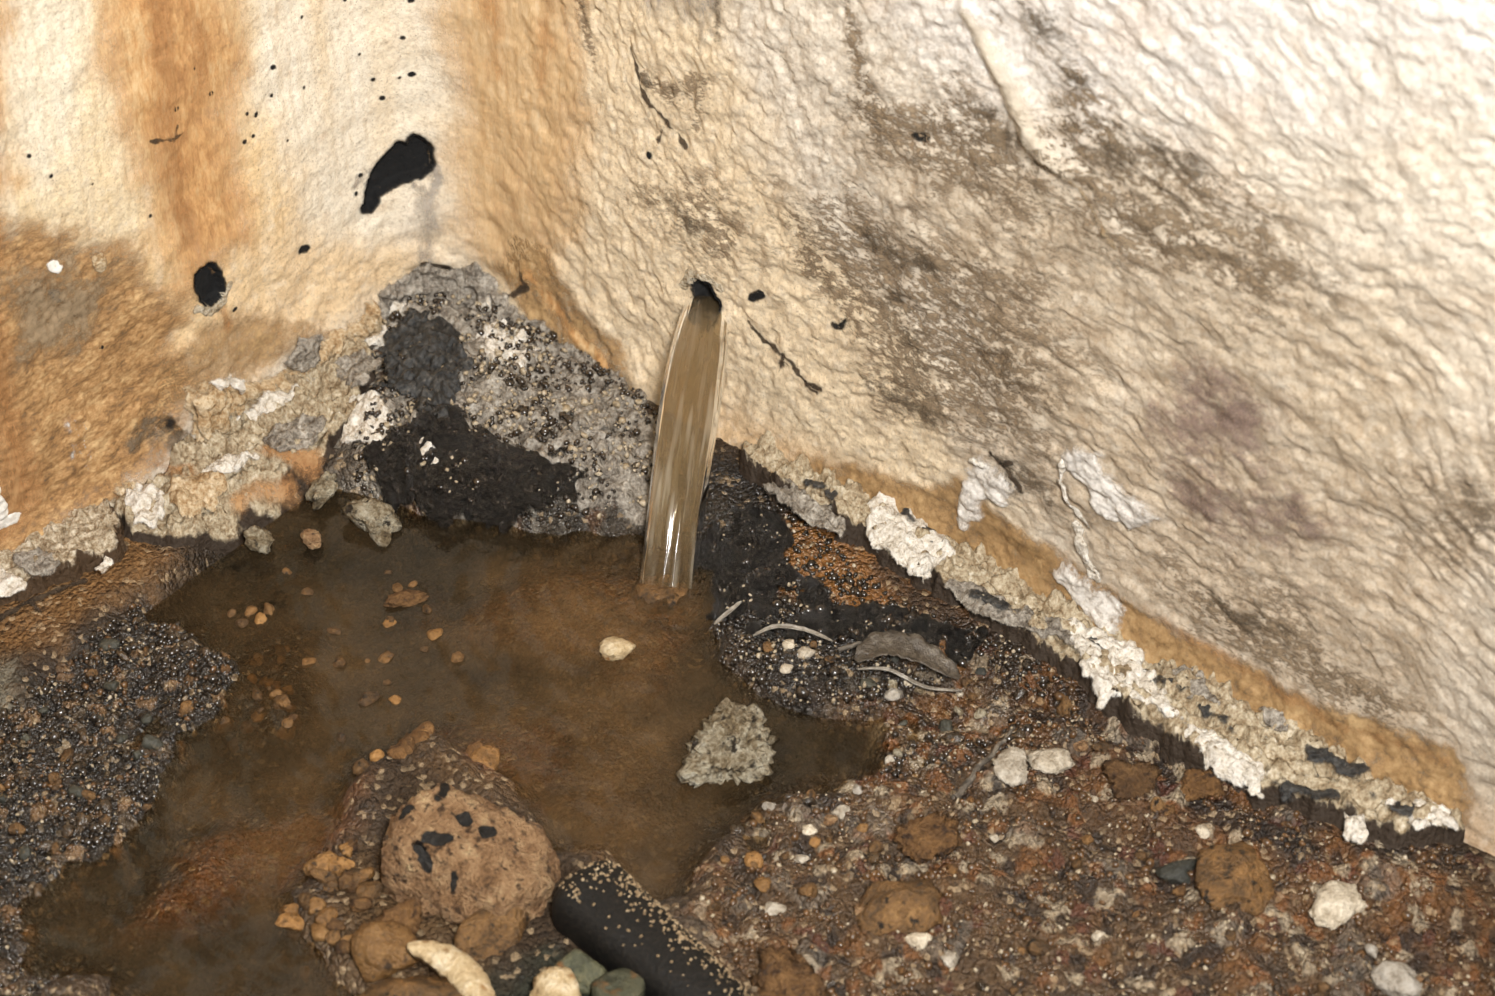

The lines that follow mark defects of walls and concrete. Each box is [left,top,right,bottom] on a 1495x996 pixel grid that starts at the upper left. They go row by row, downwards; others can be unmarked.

spalling [0,213,233,553]
corrosion [100,0,251,291]
damp [0,257,693,606]
damp [639,71,710,131]
damp [644,173,743,260]
crack [747,320,822,394]
damp [844,0,1312,317]
damp [739,185,1465,849]